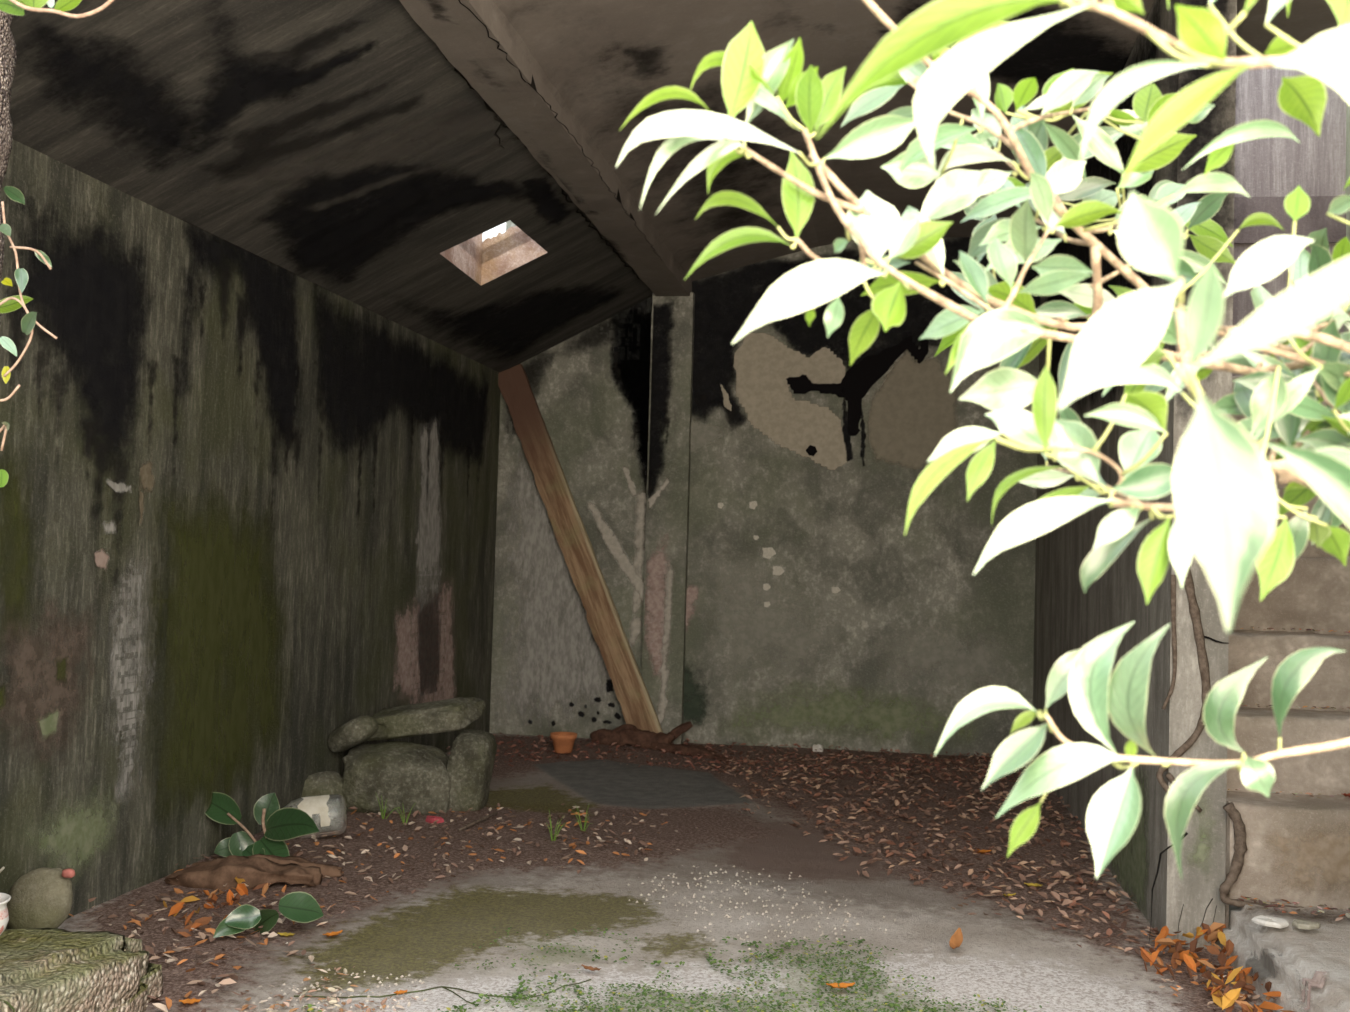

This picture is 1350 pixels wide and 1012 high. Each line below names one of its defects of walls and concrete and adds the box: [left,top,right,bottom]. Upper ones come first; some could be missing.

damp [207,91,419,178]
damp [269,25,373,97]
crack [443,54,527,148]
crack [458,0,661,279]
damp [7,290,64,413]
damp [221,266,261,394]
peeling [720,333,847,470]
peeling [868,351,957,469]
damp [83,423,128,530]
damp [411,415,445,697]
damp [0,603,89,759]
damp [110,567,153,795]